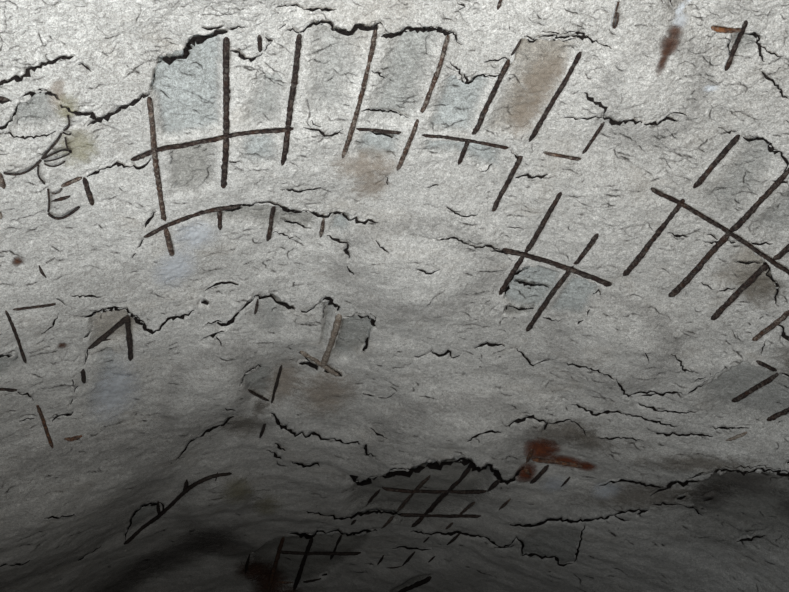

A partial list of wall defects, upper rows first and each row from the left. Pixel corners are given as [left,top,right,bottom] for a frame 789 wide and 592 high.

crack [0,4,463,139]
crack [450,57,508,84]
spalling [529,52,582,142]
spalling [131,32,314,256]
spalling [492,156,523,212]
spalling [543,122,605,161]
spalling [693,134,740,188]
spalling [499,192,612,331]
spalling [623,168,789,320]
spalling [88,315,133,361]
spalling [356,458,500,529]
rust [519,439,595,481]